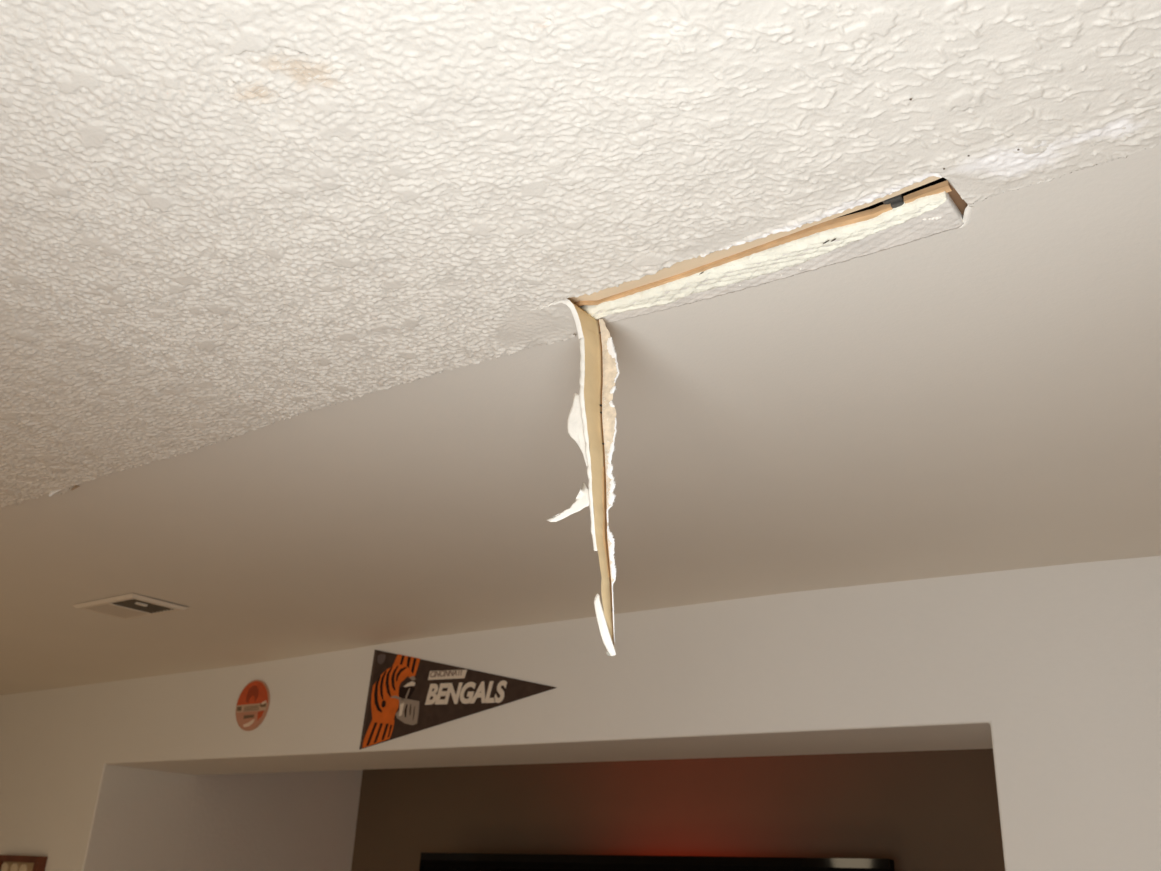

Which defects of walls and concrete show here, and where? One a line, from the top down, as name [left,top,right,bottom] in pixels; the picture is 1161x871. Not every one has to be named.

peeling [567,393,588,468]
peeling [547,482,590,522]